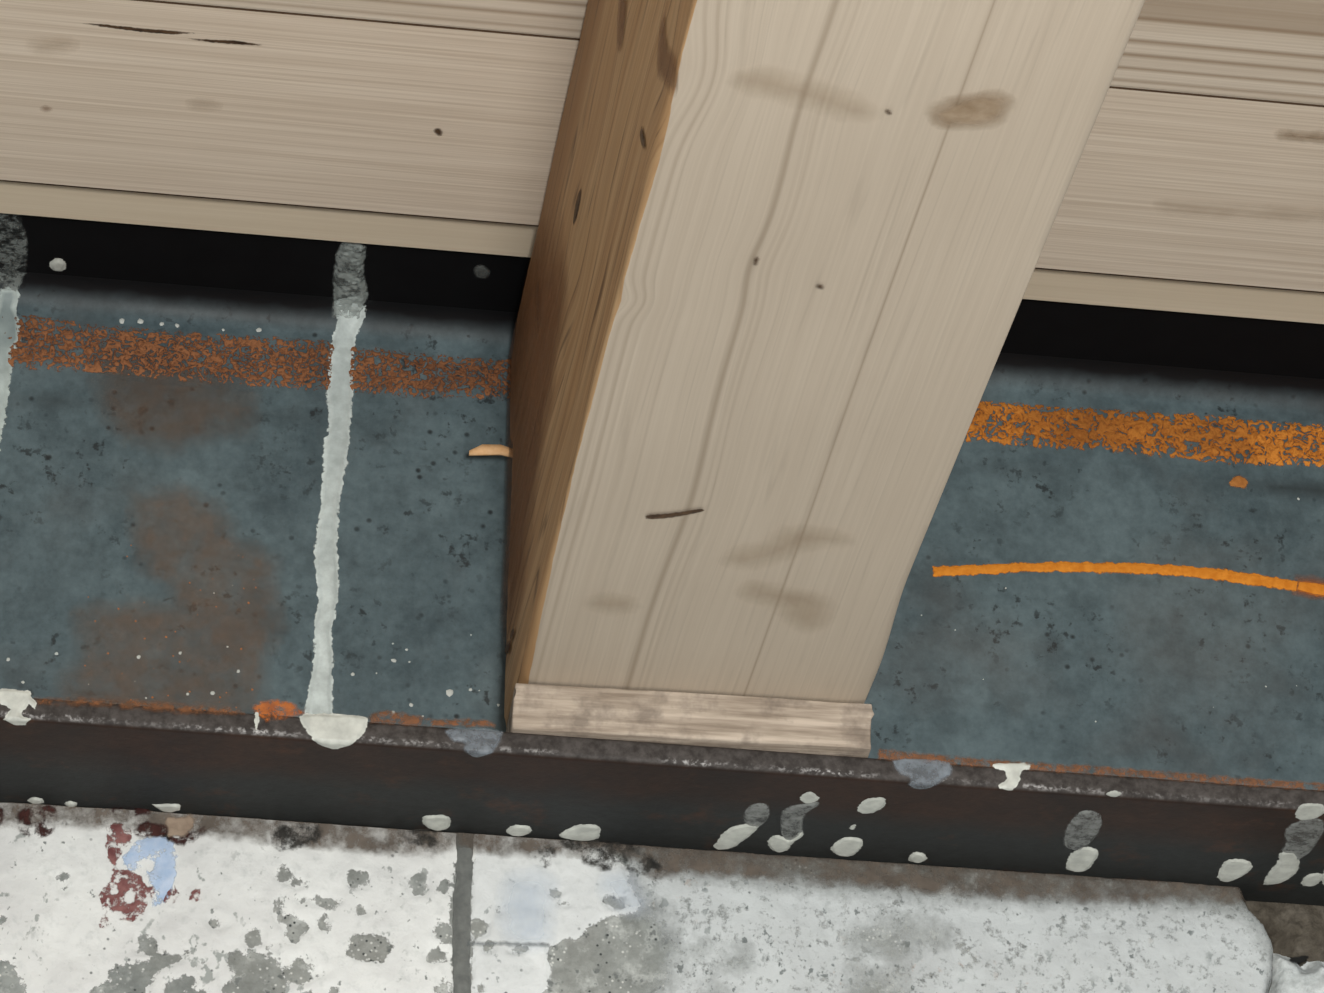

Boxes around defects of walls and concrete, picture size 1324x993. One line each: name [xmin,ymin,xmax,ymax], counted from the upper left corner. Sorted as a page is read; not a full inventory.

rust [2,315,335,390]
rust [349,346,511,399]
rust [966,401,1324,488]
rust [40,698,302,721]
rust [369,711,494,727]
rust [878,749,1324,790]
peeling [0,803,641,993]